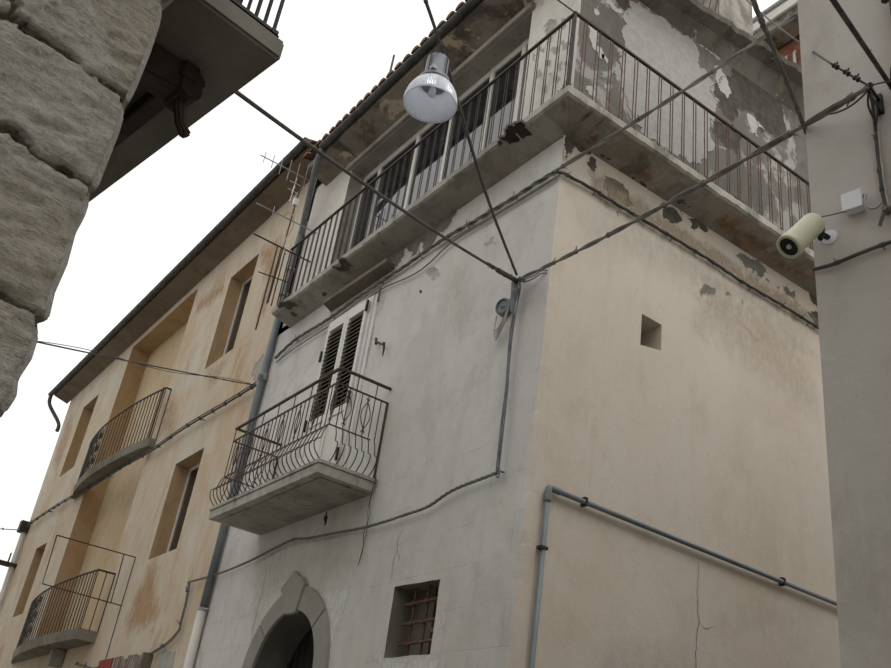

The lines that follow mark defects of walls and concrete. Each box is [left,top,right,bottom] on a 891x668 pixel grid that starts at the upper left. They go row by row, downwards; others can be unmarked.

flaking render [594,0,632,16]
flaking render [588,25,608,64]
spalling [497,119,539,146]
flaking render [661,199,709,234]
flaking render [698,282,743,305]
flaking render [735,252,819,328]
crack [695,563,712,668]